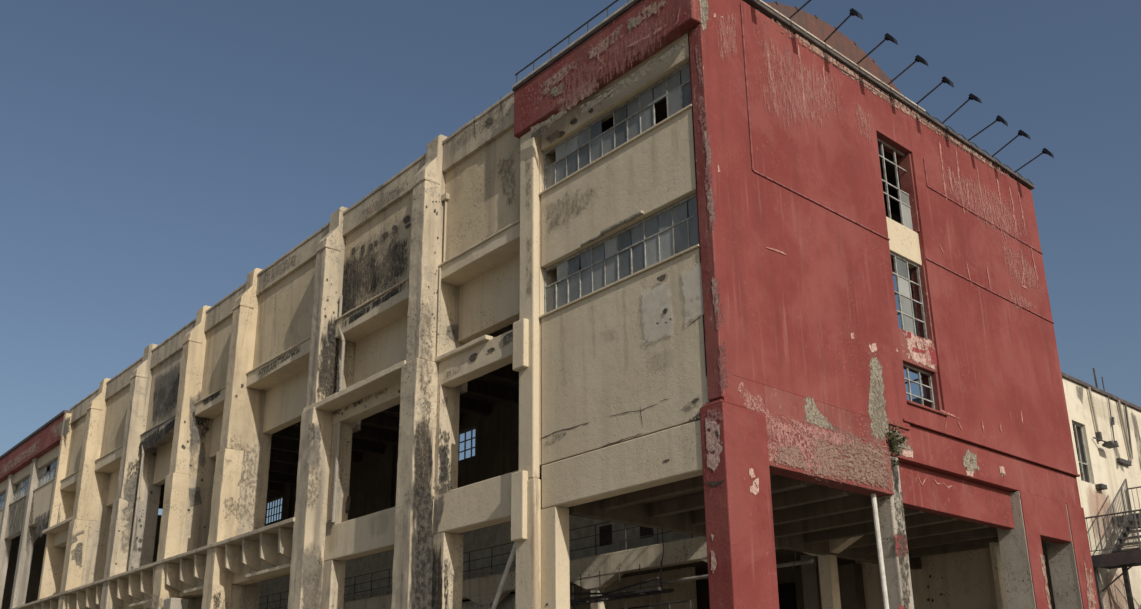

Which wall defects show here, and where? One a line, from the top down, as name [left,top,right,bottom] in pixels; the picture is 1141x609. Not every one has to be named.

peeling [530,0,720,231]
water stain [317,221,408,400]
water stain [409,304,453,609]
crack [541,398,669,447]
peeling [684,398,723,472]
peeling [712,277,913,495]
peeling [896,330,937,370]
spalling [963,449,979,477]
water stain [302,549,323,609]